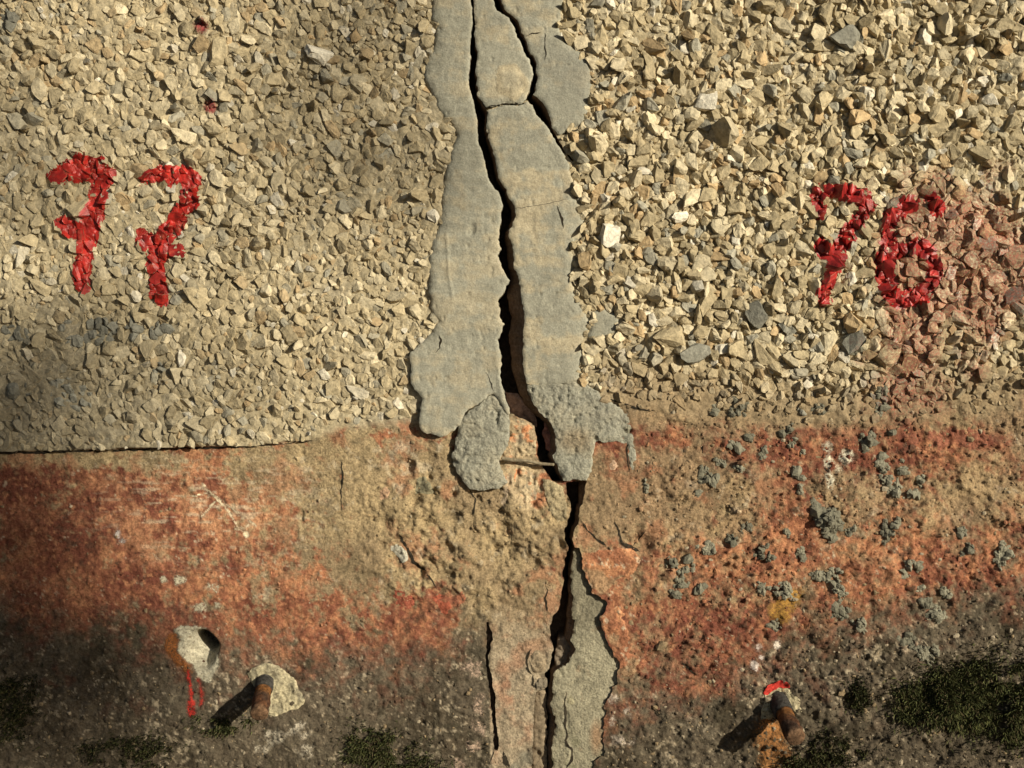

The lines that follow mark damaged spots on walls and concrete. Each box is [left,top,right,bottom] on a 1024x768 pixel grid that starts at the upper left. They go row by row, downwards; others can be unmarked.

crack [468,0,645,768]
rust [769,590,802,624]
spalling [174,626,220,683]